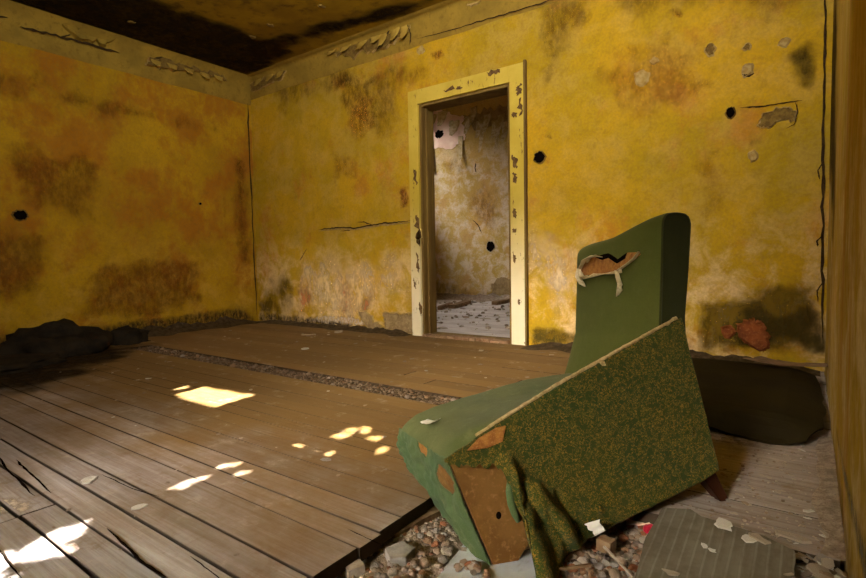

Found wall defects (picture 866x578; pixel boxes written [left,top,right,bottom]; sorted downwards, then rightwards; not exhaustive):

flaking render [328,24,411,60]
peeling [433,83,523,167]
spalling [756,106,797,129]
crack [816,0,827,342]
crack [319,220,410,231]
leakage [700,285,825,351]